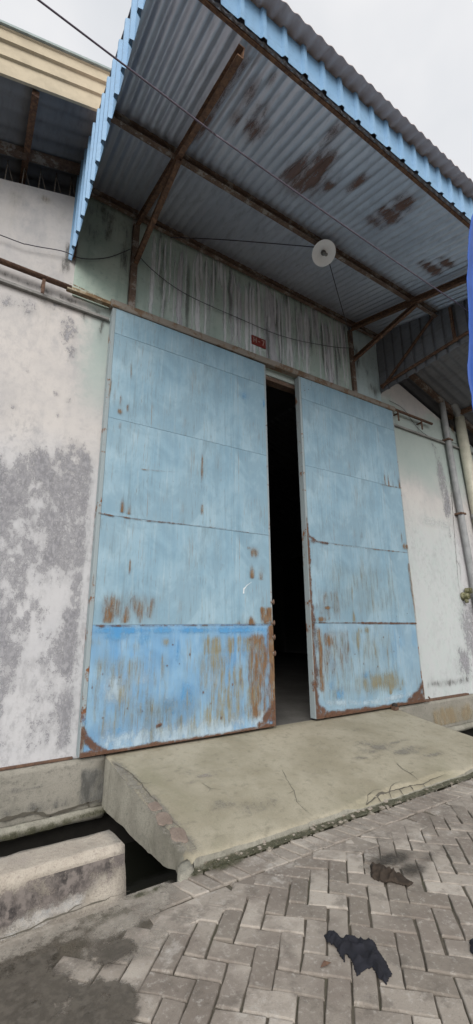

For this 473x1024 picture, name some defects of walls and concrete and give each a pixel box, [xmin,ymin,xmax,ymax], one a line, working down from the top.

rust [279,124,339,194]
rust [367,195,415,226]
rust [419,258,453,275]
rust [96,596,208,627]
rust [306,517,425,719]
rust [79,607,276,758]
crack [366,769,446,805]